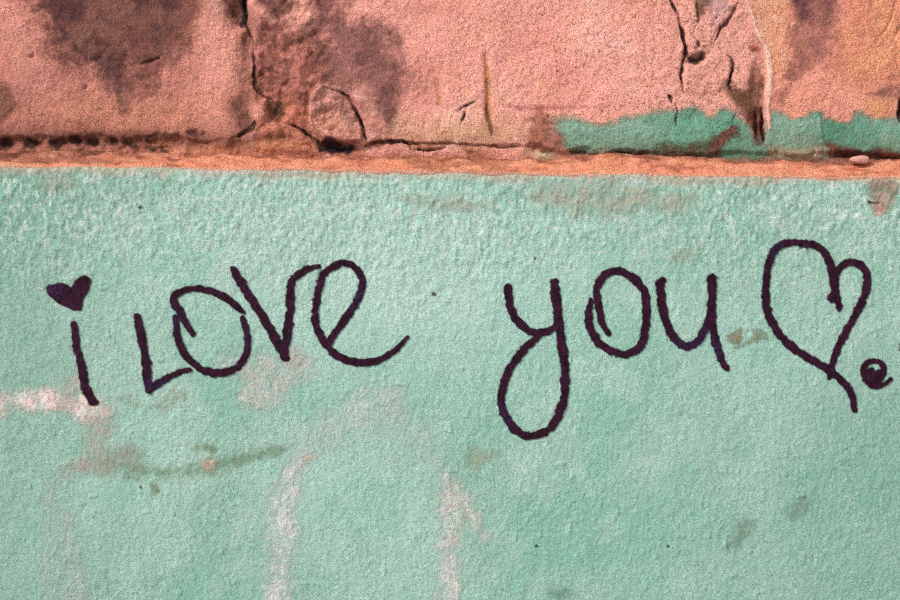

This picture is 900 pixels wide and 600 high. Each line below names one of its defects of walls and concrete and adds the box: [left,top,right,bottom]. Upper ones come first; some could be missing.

crack [245,0,268,98]
crack [668,0,737,122]
crack [237,120,256,137]
damp [267,101,285,121]
crack [292,124,320,143]
damp [317,83,397,128]
crack [337,89,501,152]
crack [758,113,766,142]
peeling [767,145,830,160]